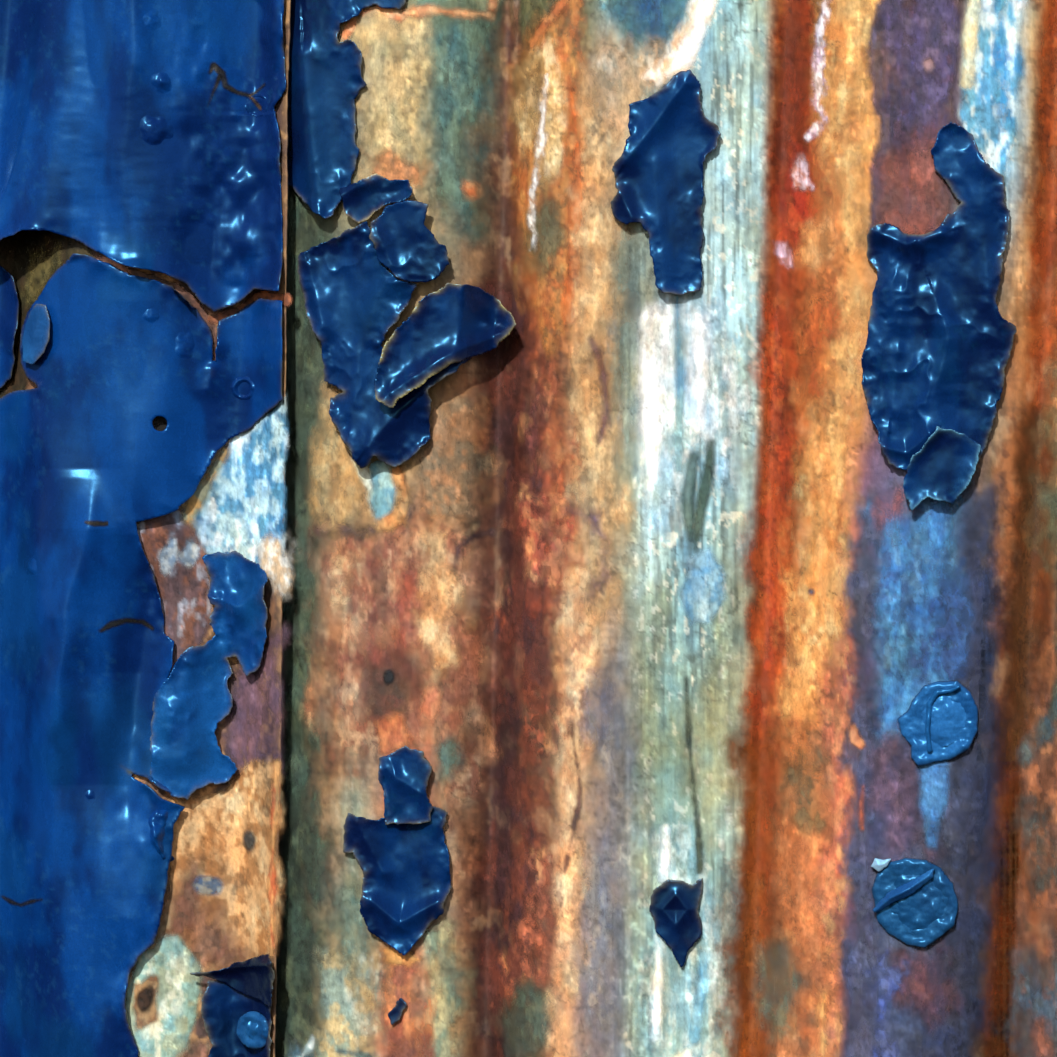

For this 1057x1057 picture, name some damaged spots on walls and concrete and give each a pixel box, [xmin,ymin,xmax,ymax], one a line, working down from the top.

peeling [22,304,50,364]
peeling [288,0,516,469]
peeling [610,70,721,295]
peeling [861,122,1017,510]
peeling [150,398,290,800]
rust [315,0,635,1057]
rust [721,0,874,1057]
rust [983,0,1057,1057]
peeling [125,936,275,1057]
peeling [343,745,452,955]
peeling [649,878,703,967]